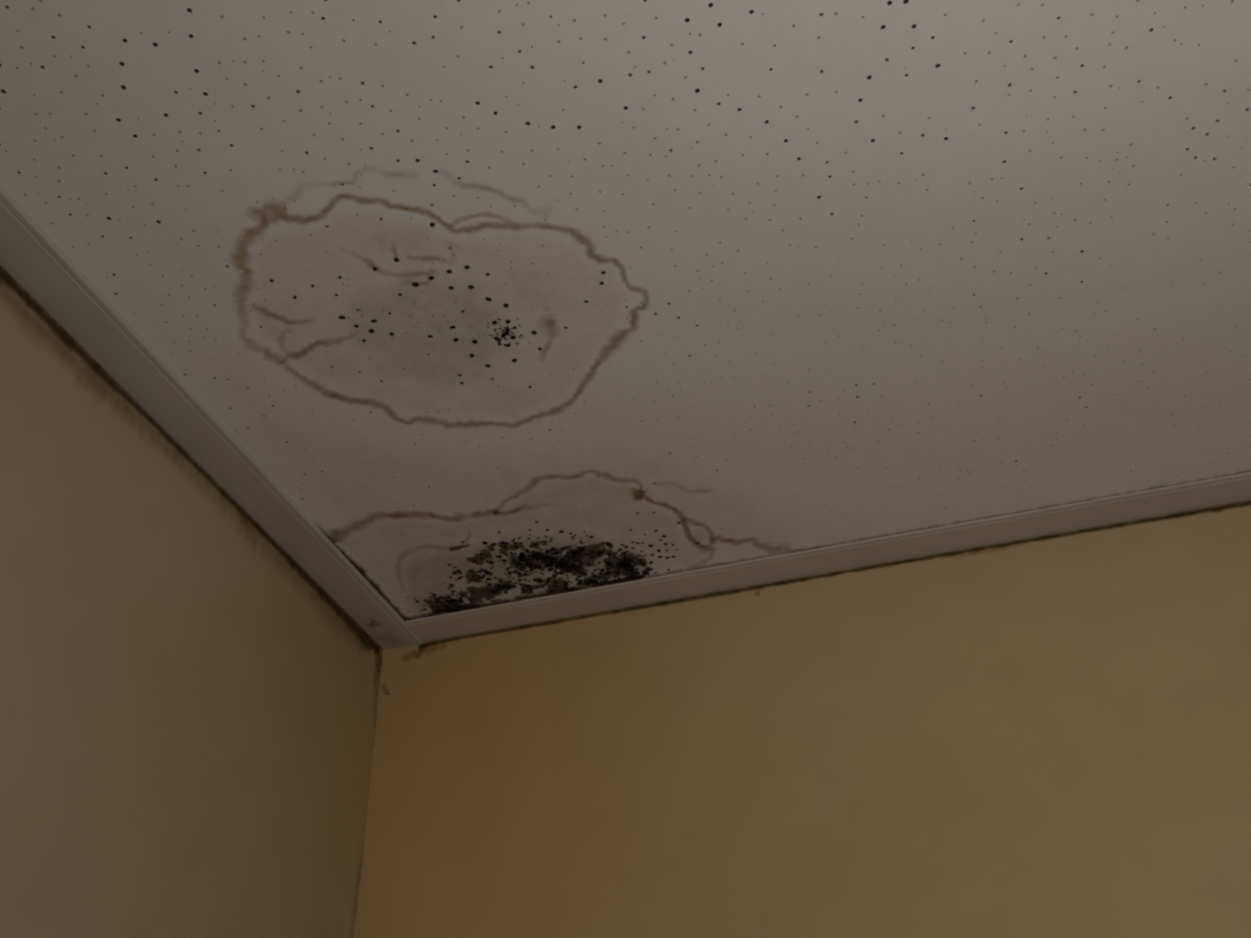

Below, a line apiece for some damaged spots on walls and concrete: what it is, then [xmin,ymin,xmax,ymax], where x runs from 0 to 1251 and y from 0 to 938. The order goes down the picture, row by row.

damp [339,304,394,343]
damp [398,255,542,380]
damp [328,521,678,621]